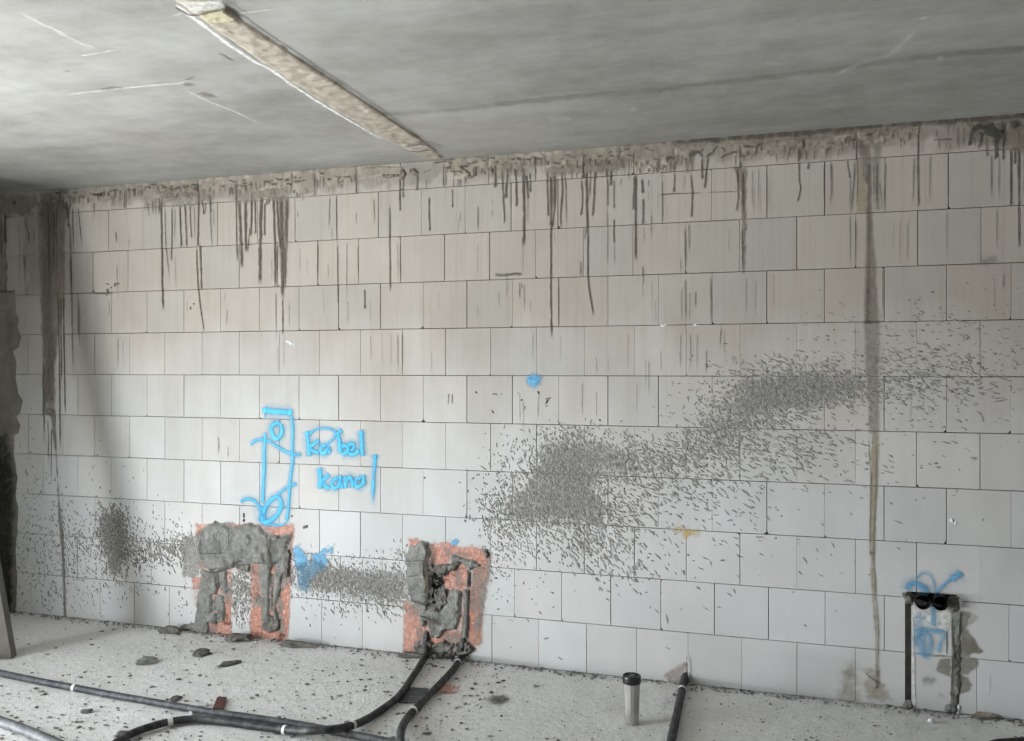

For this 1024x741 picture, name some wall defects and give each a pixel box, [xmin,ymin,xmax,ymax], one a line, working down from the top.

water stain [382,168,419,288]
water stain [935,120,1024,244]
water stain [0,171,350,475]
water stain [445,129,919,696]
spalling [431,571,471,602]